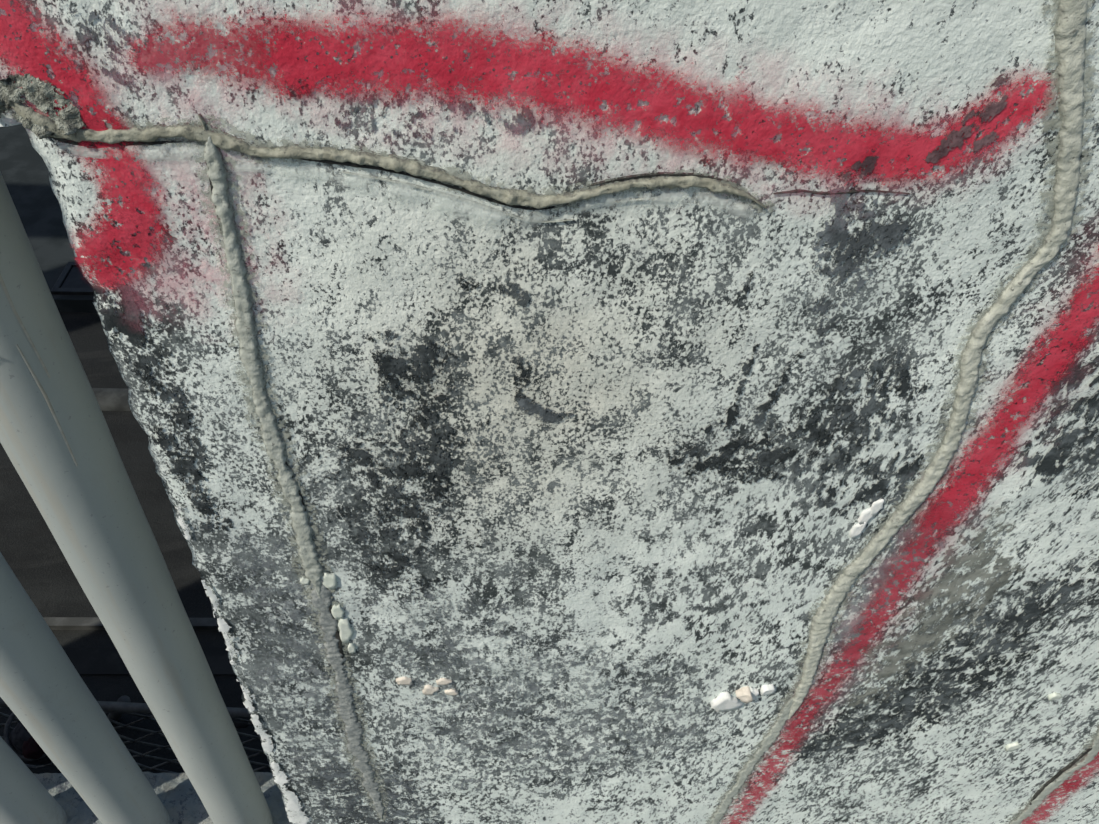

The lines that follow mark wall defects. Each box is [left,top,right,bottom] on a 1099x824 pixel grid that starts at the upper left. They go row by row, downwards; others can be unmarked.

crack [9,95,910,821]
crack [706,0,1099,824]